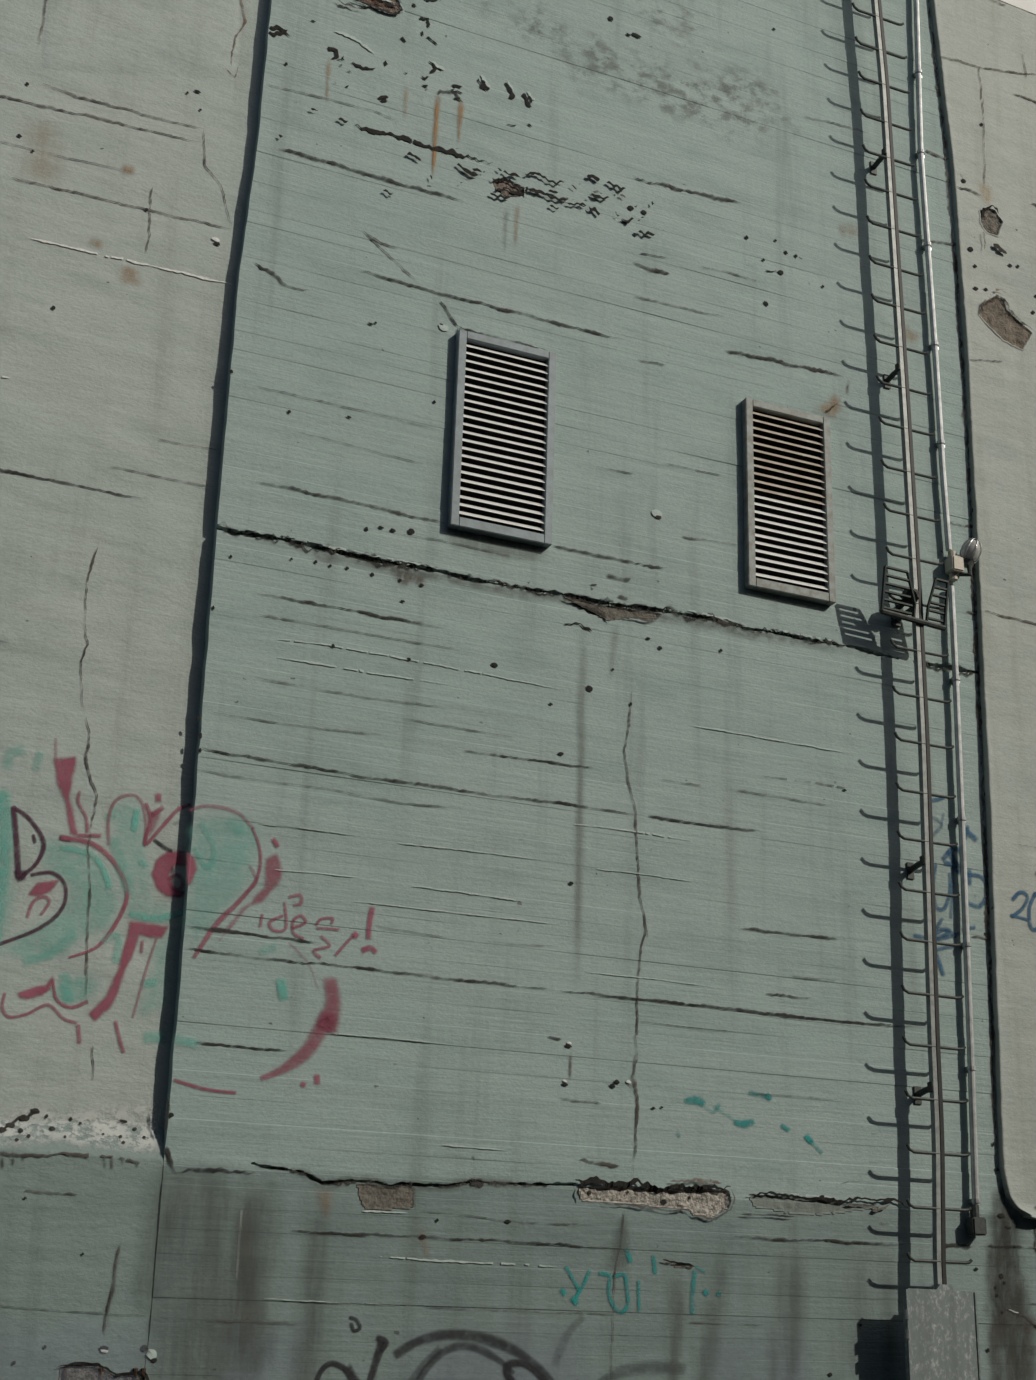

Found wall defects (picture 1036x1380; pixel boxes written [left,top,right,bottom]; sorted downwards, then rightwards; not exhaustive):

spalling [338,0,462,100]
rust [433,90,463,169]
spalling [457,163,655,236]
spalling [968,205,1019,268]
spalling [974,286,1036,351]
crack [221,482,873,654]
crack [913,661,975,676]
crack [81,548,98,992]
crack [189,690,904,1168]
crack [164,1098,624,1377]
spalling [575,1176,909,1220]
water stain [990,1187,1032,1380]